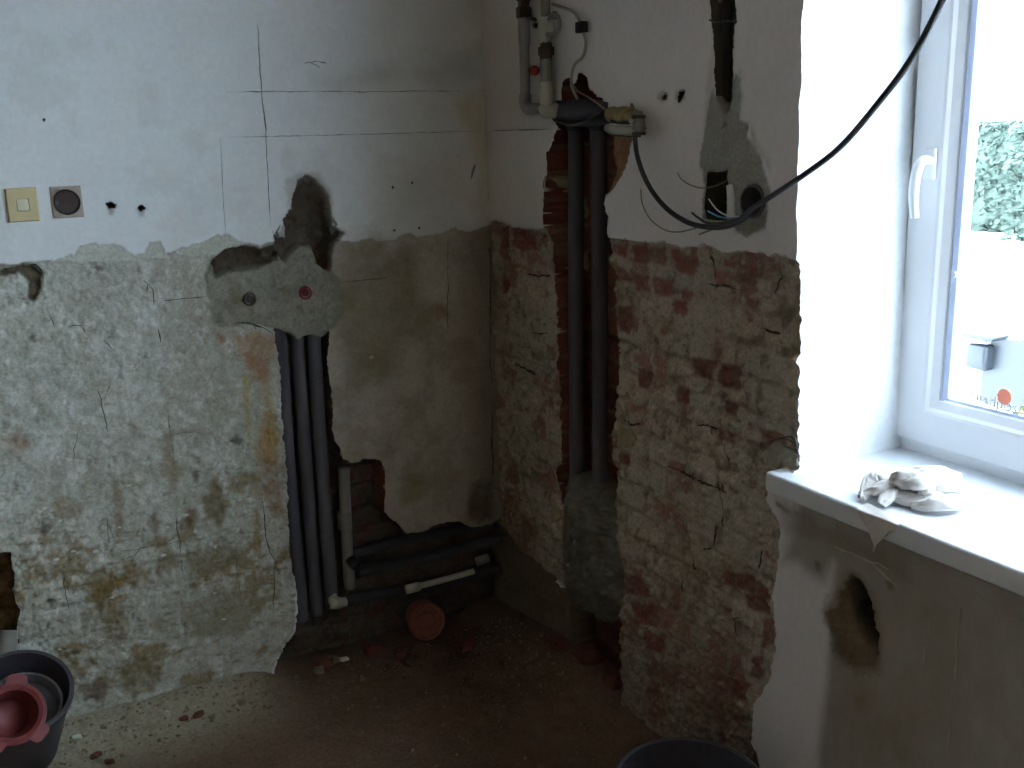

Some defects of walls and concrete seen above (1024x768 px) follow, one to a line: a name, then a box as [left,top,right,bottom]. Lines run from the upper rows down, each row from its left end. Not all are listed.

spalling [704,171,728,221]
flaking render [0,224,297,719]
corrosion [217,326,288,564]
crack [261,486,280,612]
flaking render [327,220,568,587]
crack [667,424,730,591]
flaking render [609,237,802,768]
spalling [824,574,880,656]